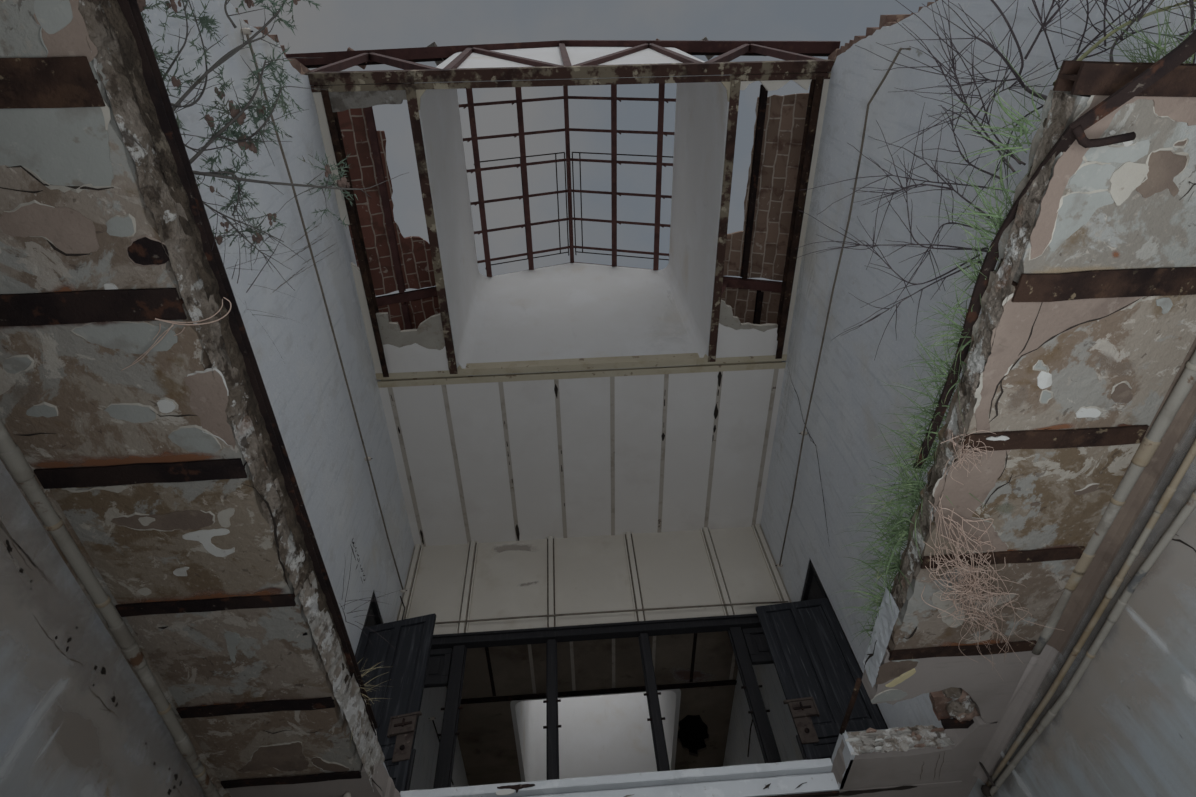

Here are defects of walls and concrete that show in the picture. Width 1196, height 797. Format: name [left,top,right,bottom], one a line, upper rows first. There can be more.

peeling [33,0,98,62]
peeling [0,101,114,193]
peeling [1029,95,1196,260]
peeling [70,321,178,354]
crack [989,296,1149,423]
peeling [26,402,58,418]
rust [31,451,214,469]
peeling [104,368,236,453]
peeling [932,293,1173,553]